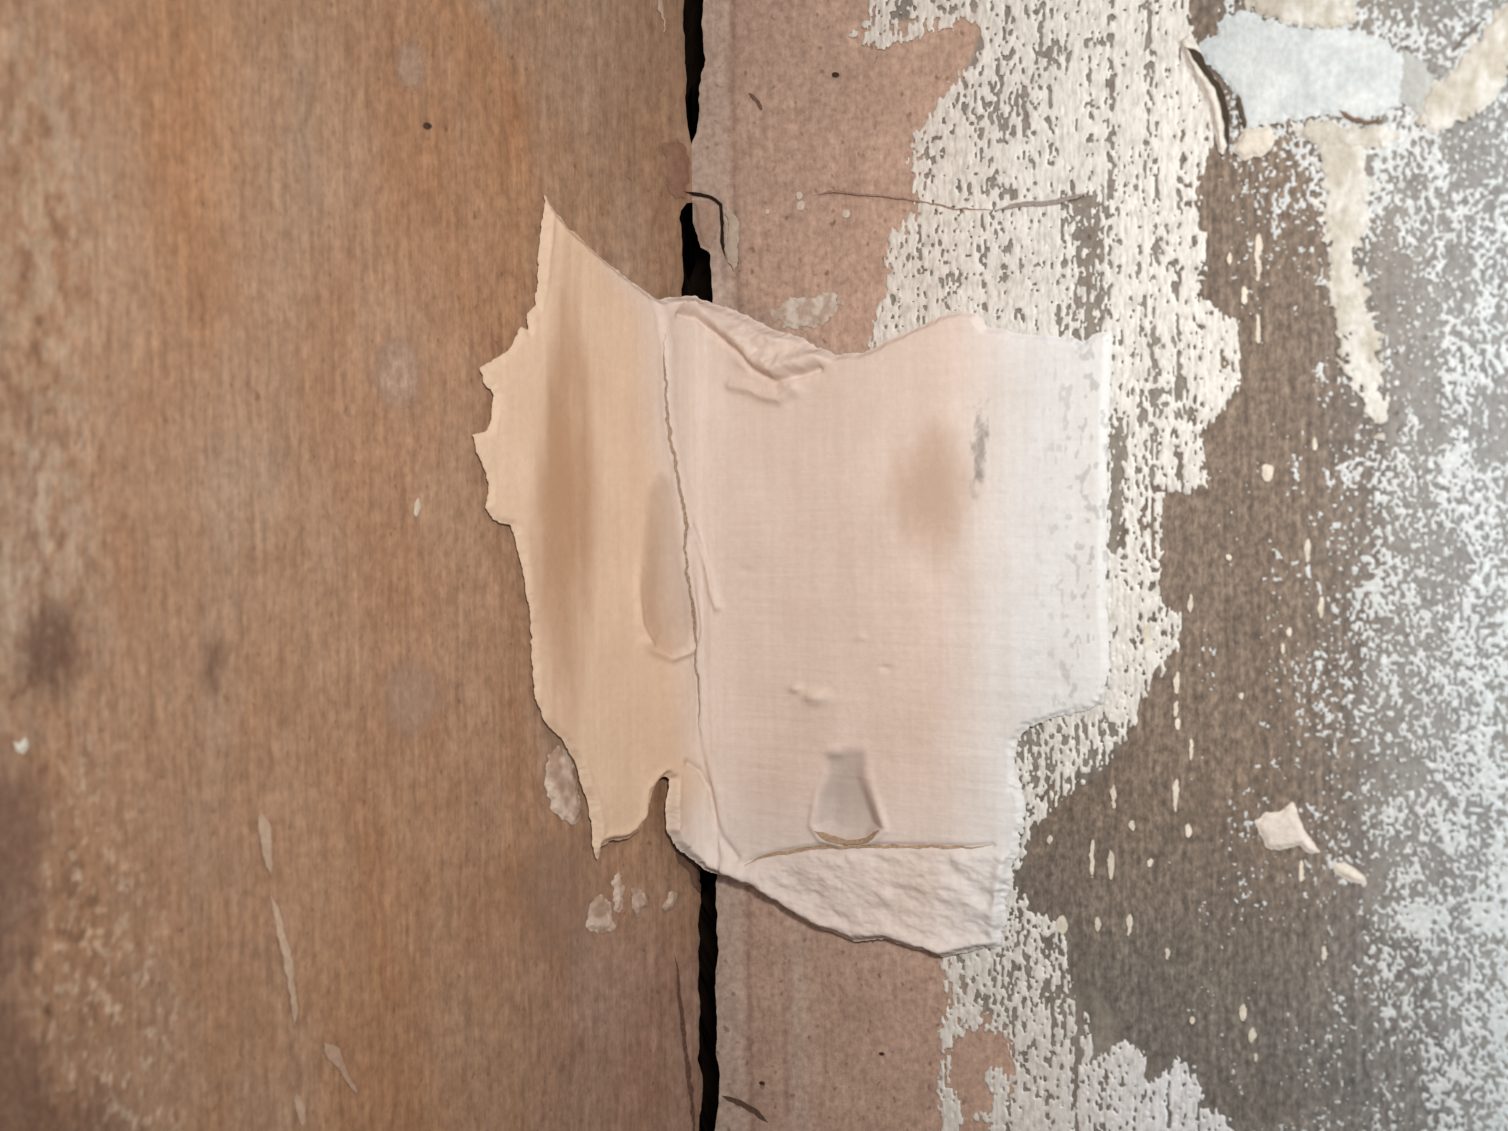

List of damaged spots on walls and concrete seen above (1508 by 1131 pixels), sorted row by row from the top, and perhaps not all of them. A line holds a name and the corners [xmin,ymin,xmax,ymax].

crack [662,0,726,303]
spalling [724,206,739,270]
spalling [796,192,805,211]
crack [663,334,701,732]
peeling [848,0,1508,1131]
spalling [815,830,879,845]
crack [672,841,768,1131]